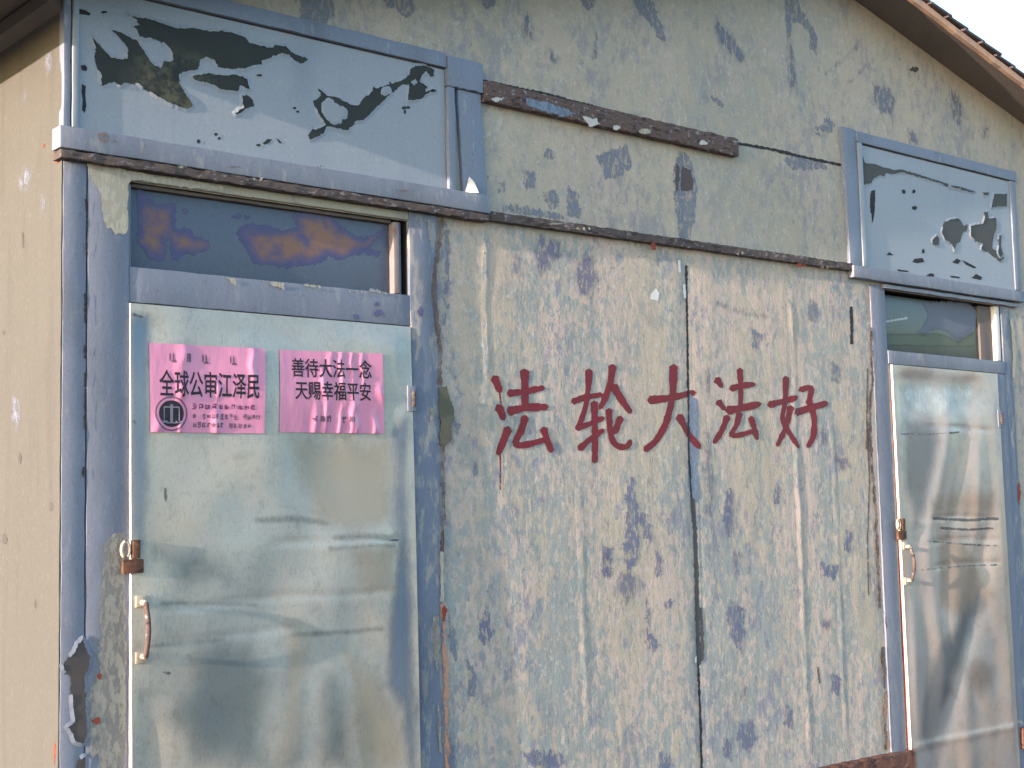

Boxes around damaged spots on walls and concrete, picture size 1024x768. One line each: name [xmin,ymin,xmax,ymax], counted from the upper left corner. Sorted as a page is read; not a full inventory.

peeling [81,12,308,118]
peeling [308,63,438,143]
peeling [673,152,698,239]
peeling [863,155,1008,280]
peeling [59,532,127,768]
rust [440,551,451,768]